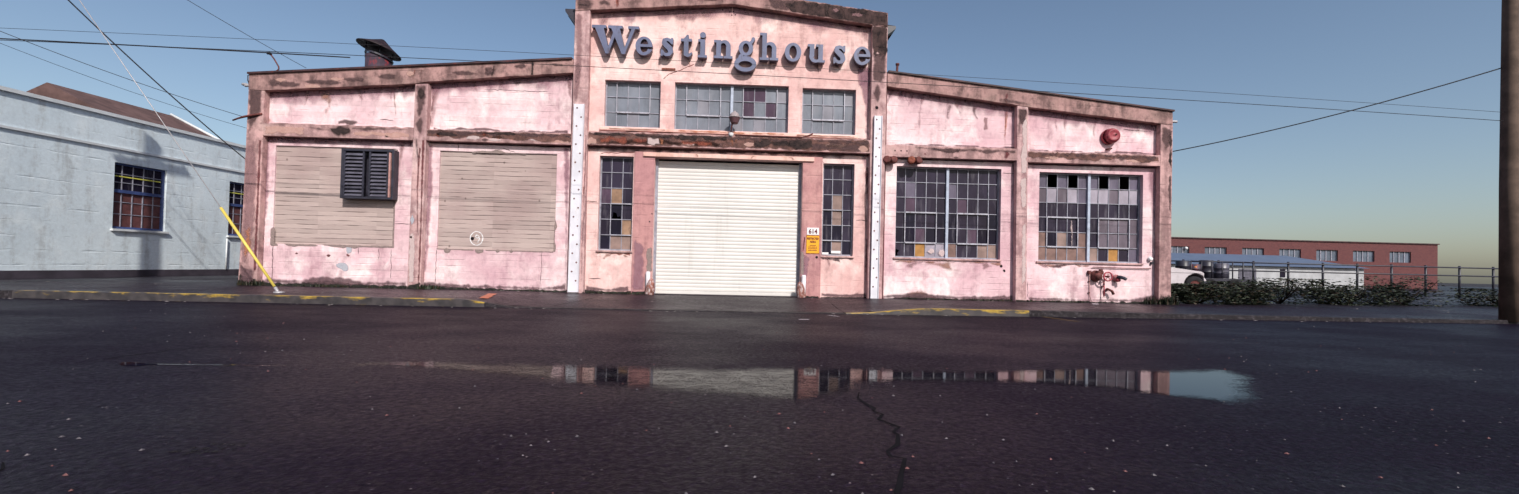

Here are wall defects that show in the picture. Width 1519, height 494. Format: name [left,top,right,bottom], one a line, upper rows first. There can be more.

damp [239,0,1172,294]
spalling [270,201,415,282]
spalling [436,220,557,253]
damp [885,292,1164,304]
crack [857,392,907,494]